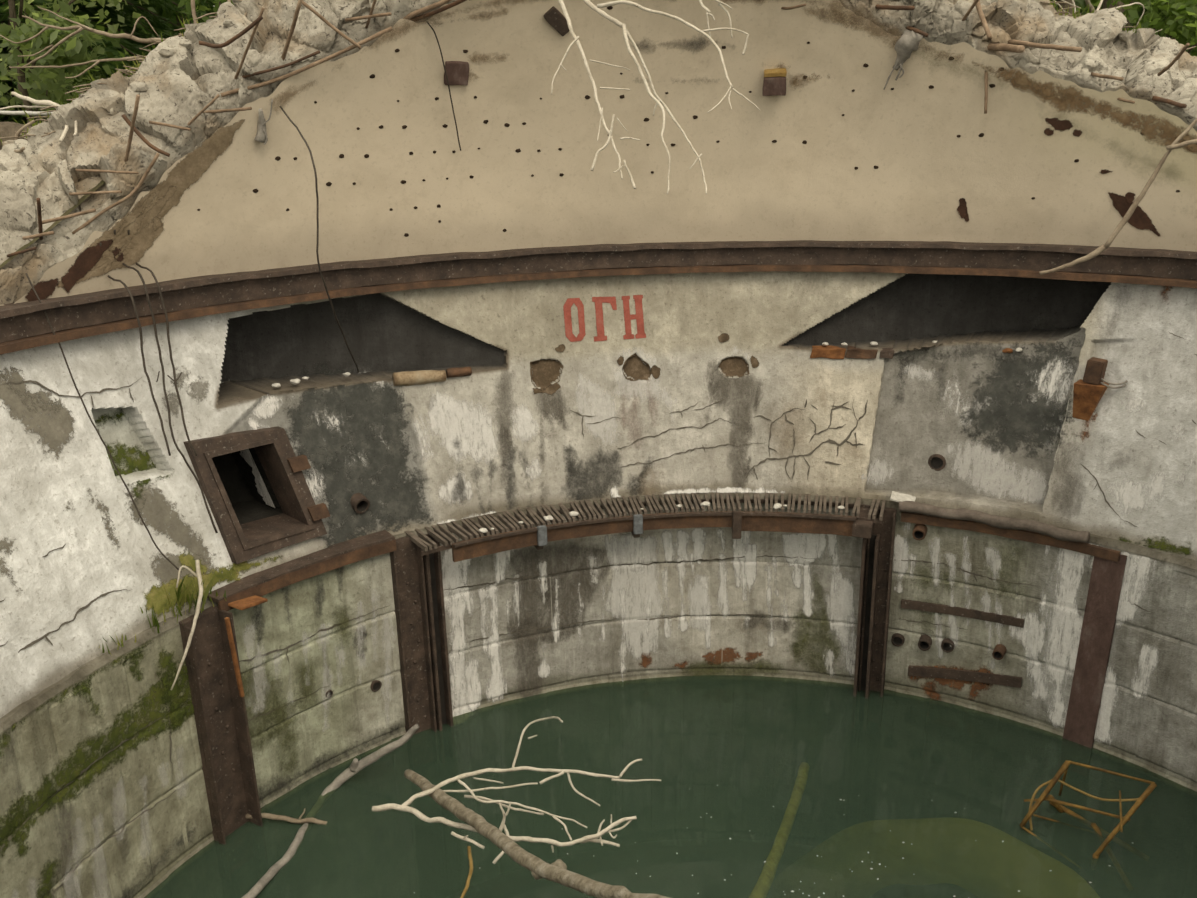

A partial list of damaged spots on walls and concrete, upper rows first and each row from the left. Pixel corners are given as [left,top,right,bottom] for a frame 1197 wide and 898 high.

spalling [781,0,1197,152]
spalling [0,0,471,305]
corrosion [1044,118,1082,137]
corrosion [957,198,969,222]
peeling [1108,192,1160,237]
spalling [617,353,660,381]
damp [239,449,275,508]
damp [249,364,565,547]
crack [570,394,868,481]
damp [899,338,1080,504]
damp [441,528,857,717]
corrosion [702,647,763,666]